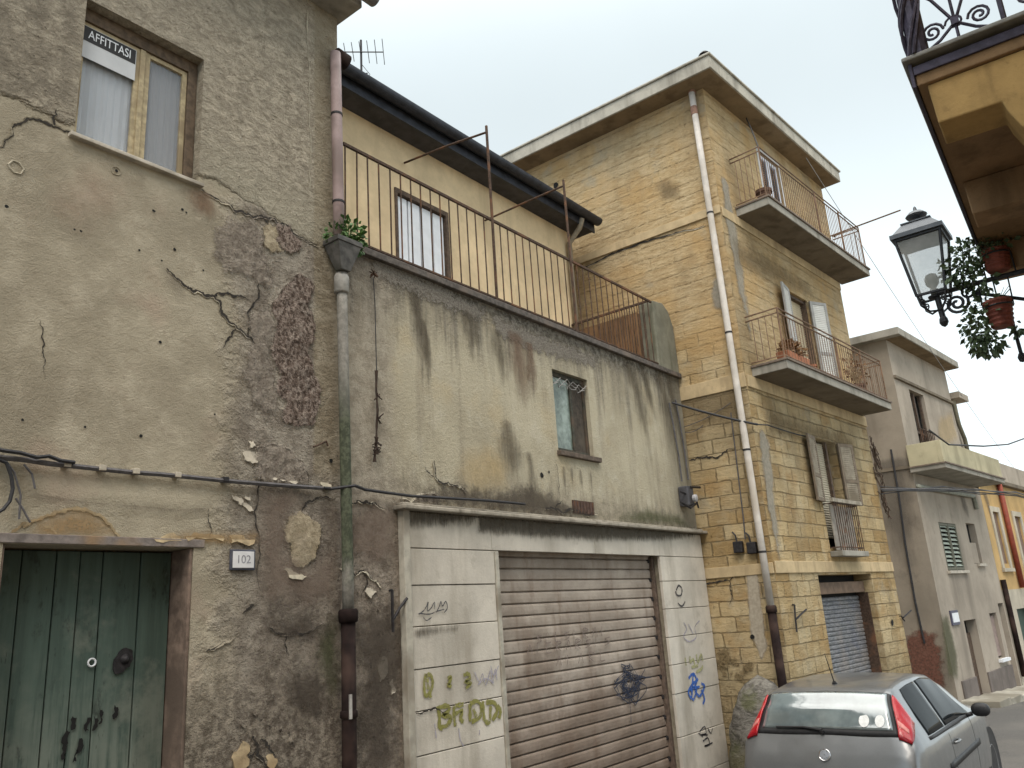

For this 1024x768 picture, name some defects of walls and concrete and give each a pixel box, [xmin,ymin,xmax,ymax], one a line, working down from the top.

crack [0,110,70,148]
crack [201,189,319,248]
flaking render [263,222,303,254]
crack [585,225,704,267]
crack [166,268,260,347]
flaking render [243,272,322,430]
flaking render [231,494,254,512]
flaking render [154,532,256,546]
flaking render [282,510,323,580]
flaking render [231,695,305,768]